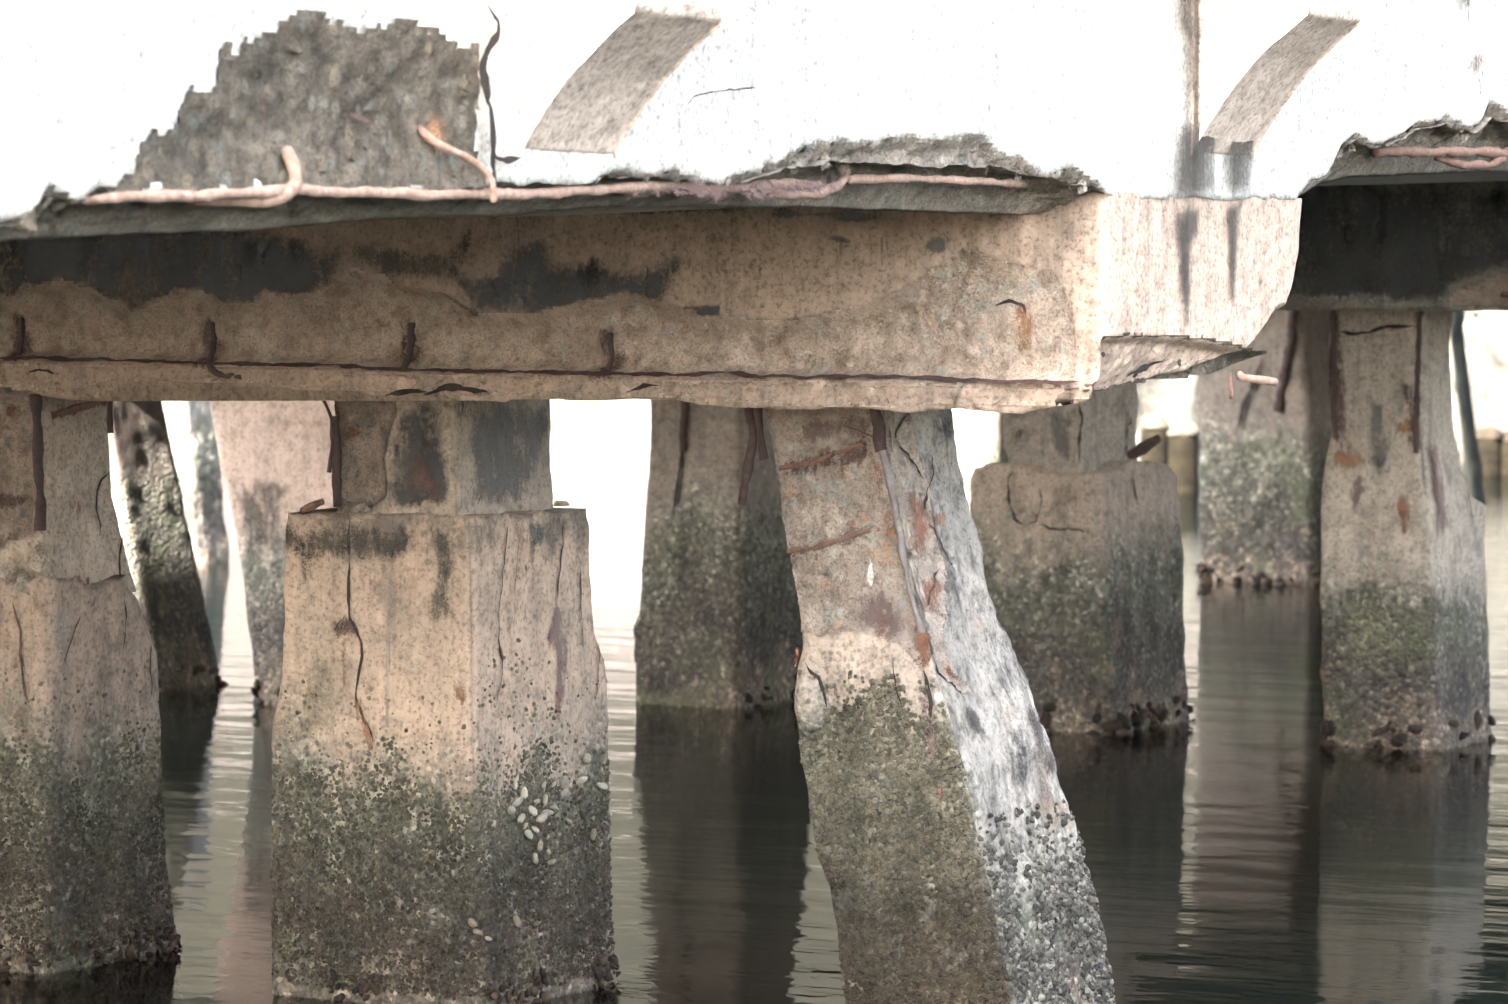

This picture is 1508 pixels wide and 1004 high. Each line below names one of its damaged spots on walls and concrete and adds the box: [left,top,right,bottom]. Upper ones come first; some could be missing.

spalling [0,9,1106,239]
spalling [1308,104,1508,185]
leakage [0,229,679,312]
leakage [1287,186,1508,304]
crack [0,355,1088,610]
spalling [0,247,1300,697]
corrosion [785,416,882,490]
corrosion [789,492,945,560]
crack [12,602,30,705]
crack [334,519,373,740]
corrosion [859,579,946,666]